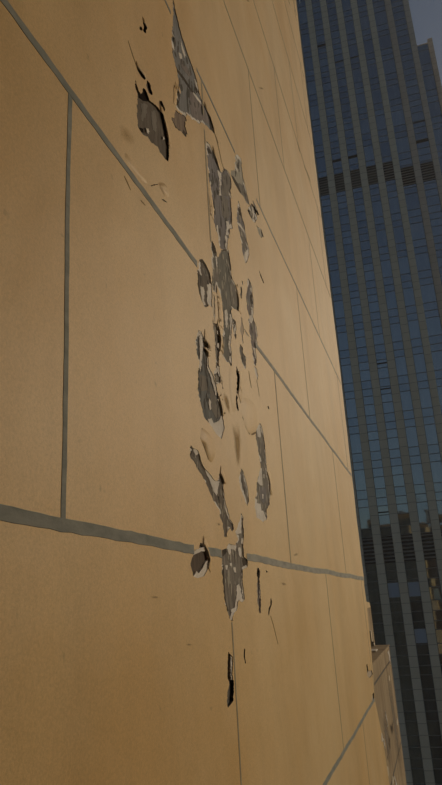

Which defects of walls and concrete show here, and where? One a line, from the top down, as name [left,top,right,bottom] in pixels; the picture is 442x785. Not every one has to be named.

peeling [135,0,216,161]
peeling [195,141,263,439]
peeling [190,446,248,621]
peeling [239,424,273,522]